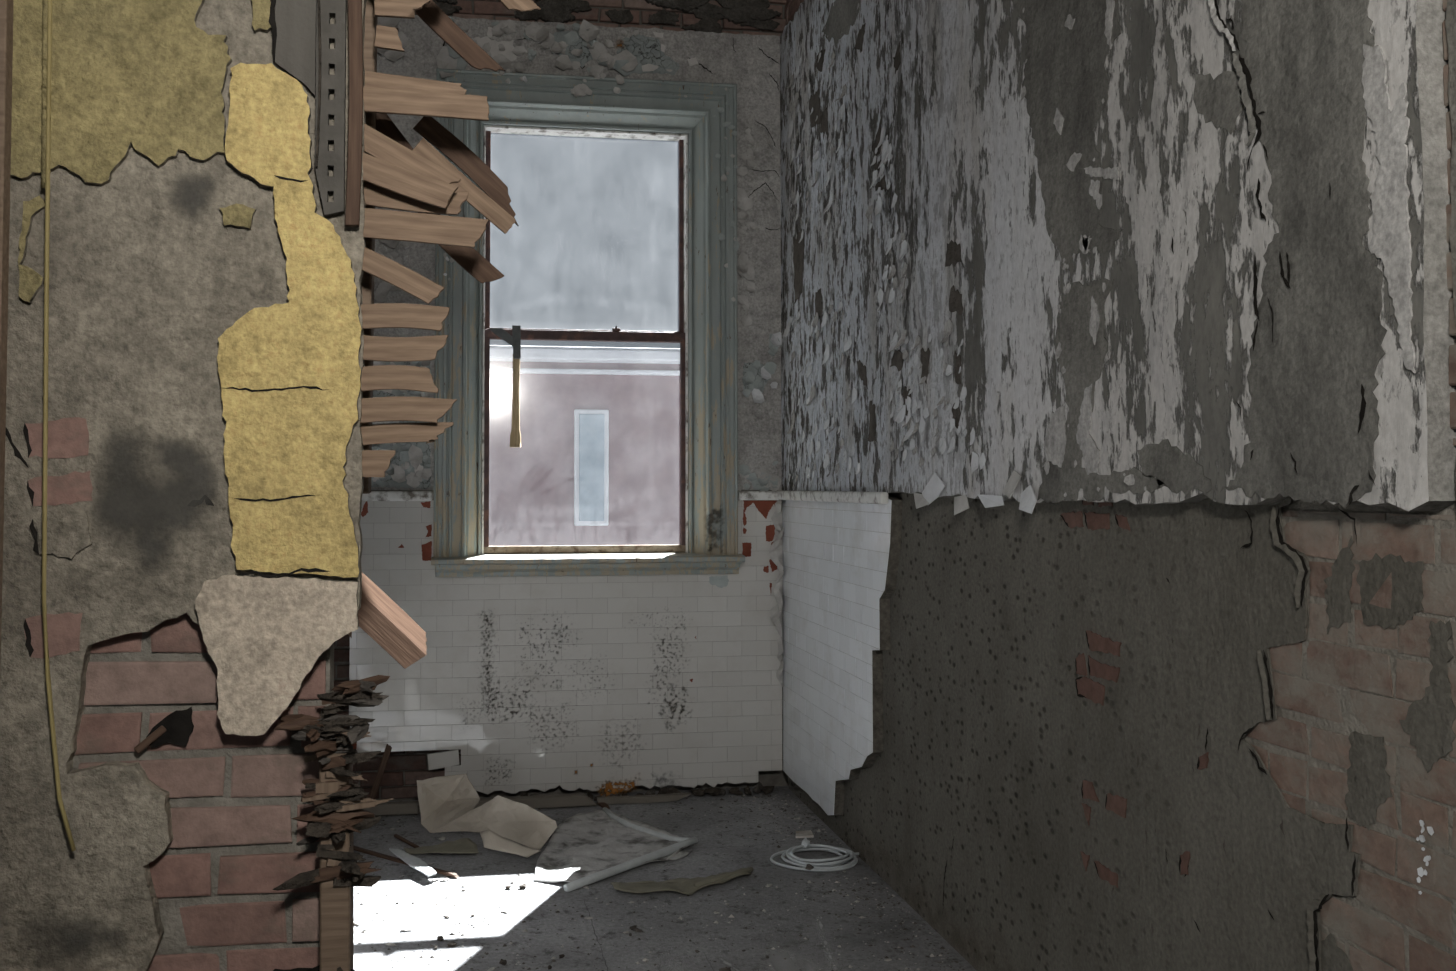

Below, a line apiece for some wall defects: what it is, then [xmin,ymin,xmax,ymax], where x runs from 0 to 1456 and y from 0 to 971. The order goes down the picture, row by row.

flaking render [10,0,433,971]
flaking render [375,0,1456,971]
damp [482,615,568,741]
damp [654,624,686,726]
spalling [352,743,461,799]